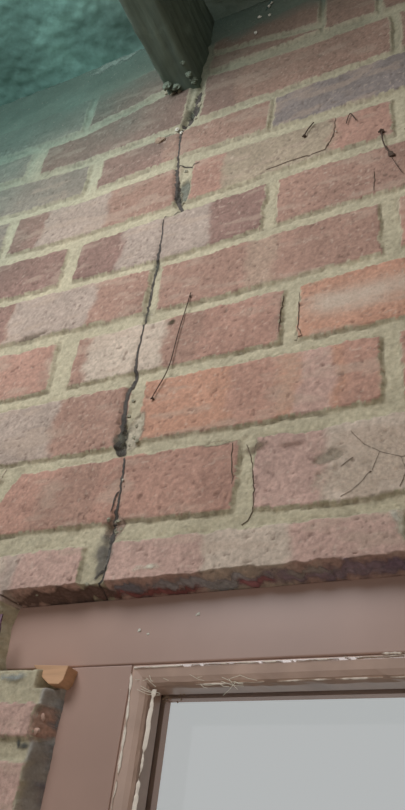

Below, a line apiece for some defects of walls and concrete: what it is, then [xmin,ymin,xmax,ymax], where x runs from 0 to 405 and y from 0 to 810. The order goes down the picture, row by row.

crack [95,92,202,601]